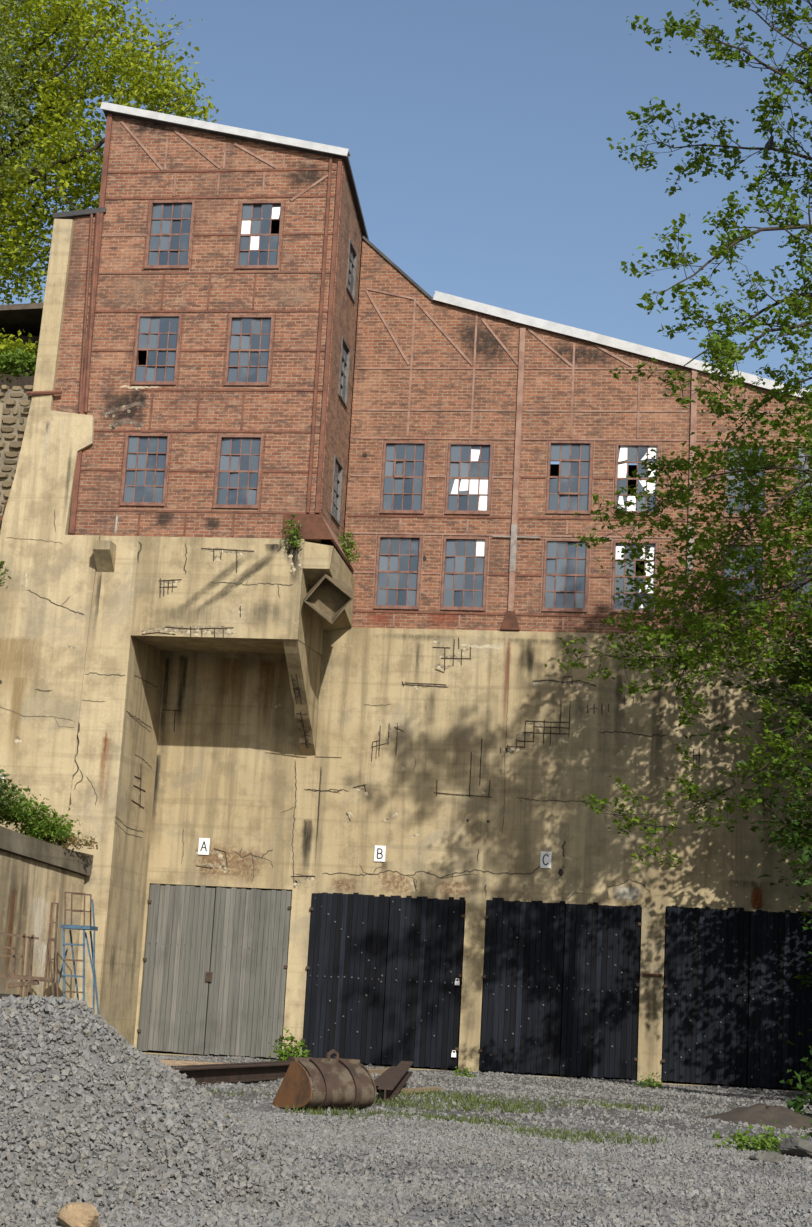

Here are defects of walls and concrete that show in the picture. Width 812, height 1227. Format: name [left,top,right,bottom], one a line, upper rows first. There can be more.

crack [1,672,157,838]
crack [235,653,606,897]
spalling [194,848,228,873]